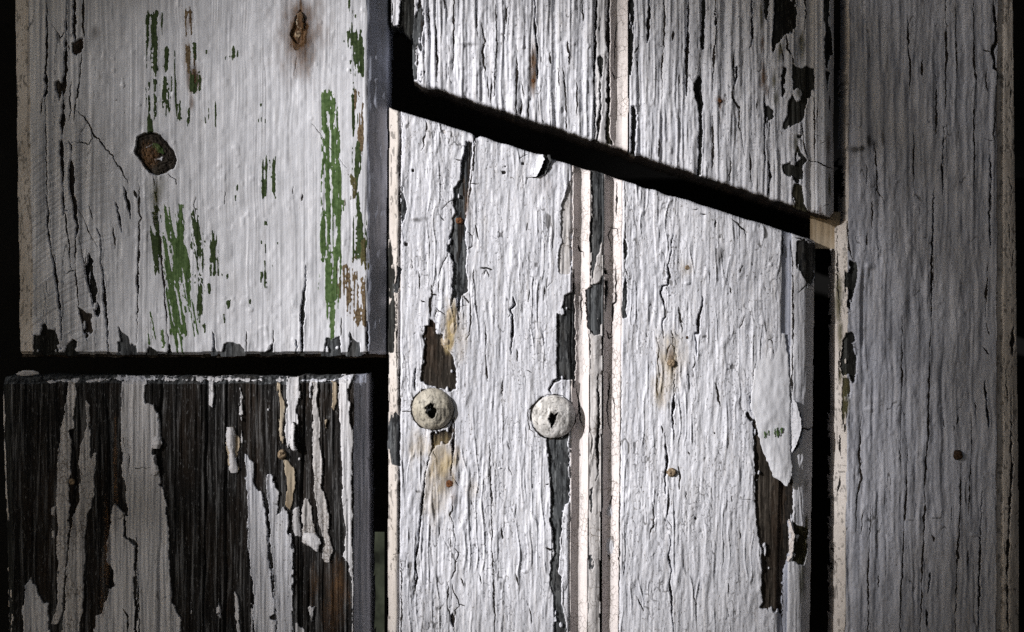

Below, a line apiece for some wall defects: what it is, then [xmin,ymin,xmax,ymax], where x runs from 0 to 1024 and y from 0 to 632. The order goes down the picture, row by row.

peeling [8,382,97,632]
crack [40,0,196,356]
peeling [93,380,182,632]
peeling [135,7,207,175]
peeling [117,191,246,357]
peeling [226,374,354,632]
rust [291,7,307,47]
peeling [300,0,370,357]
peeling [421,320,457,392]
peeling [547,435,570,632]
peeling [750,333,808,613]
peeling [764,0,835,212]